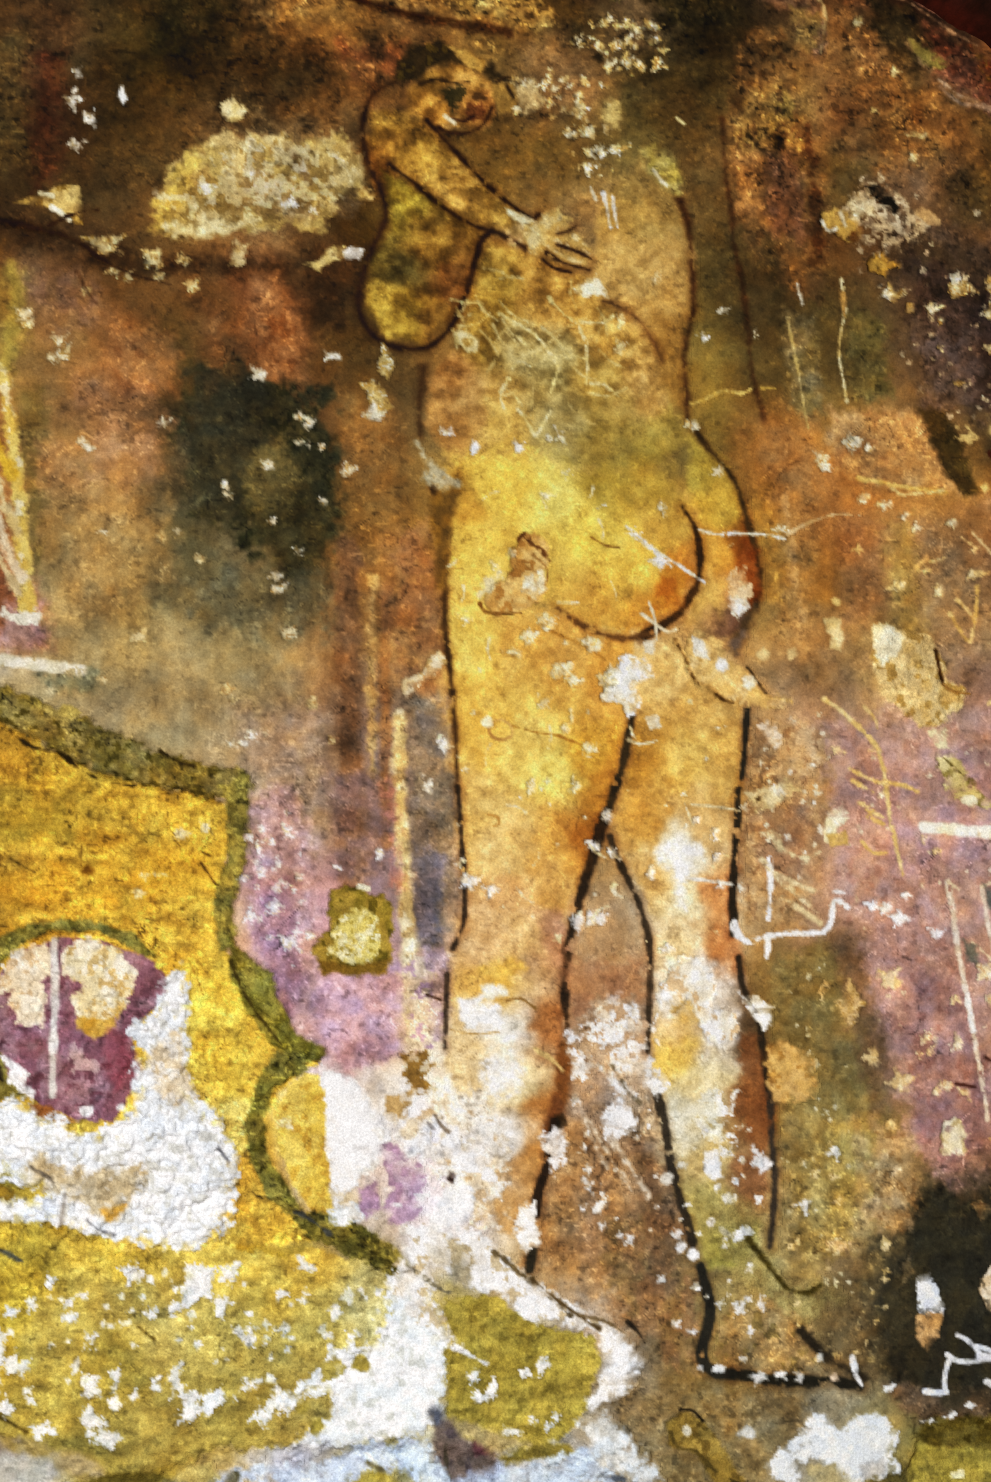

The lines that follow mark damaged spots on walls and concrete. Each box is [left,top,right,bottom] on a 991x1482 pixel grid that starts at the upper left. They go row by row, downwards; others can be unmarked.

spalling [116,84,129,107]
peeling [12,93,377,299]
spalling [819,168,991,447]
spalling [451,853,502,901]
spalling [0,724,397,1249]
spalling [382,1048,441,1128]
damp [574,1005,766,1251]
spalling [423,908,991,1384]
damp [823,1145,842,1163]
spalling [422,1291,604,1480]
damp [670,1317,700,1337]
damp [687,1176,991,1482]